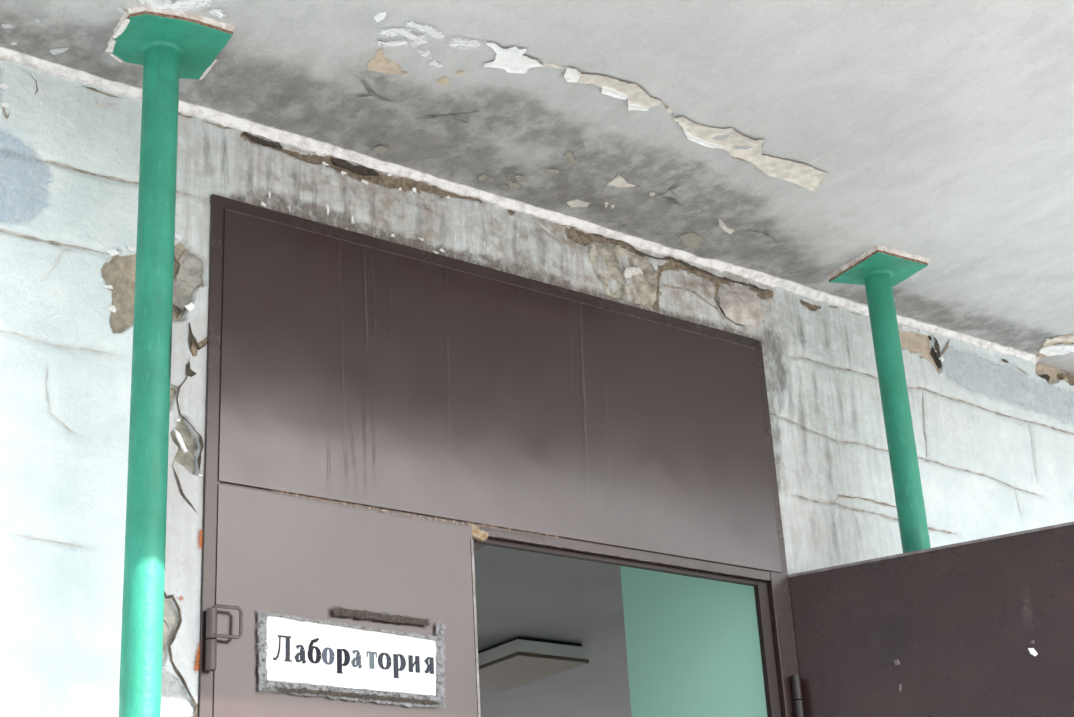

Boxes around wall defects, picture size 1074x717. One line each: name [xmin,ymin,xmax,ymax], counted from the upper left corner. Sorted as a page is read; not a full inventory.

spalling [240,131,486,203]
peeling [484,43,829,191]
spalling [101,246,136,334]
damp [233,191,793,415]
spalling [565,225,646,259]
crack [516,213,764,327]
spalling [170,358,204,515]
crack [769,413,888,451]
crack [907,387,1074,511]
crack [792,494,898,521]
crack [928,526,955,534]
spalling [161,591,198,717]